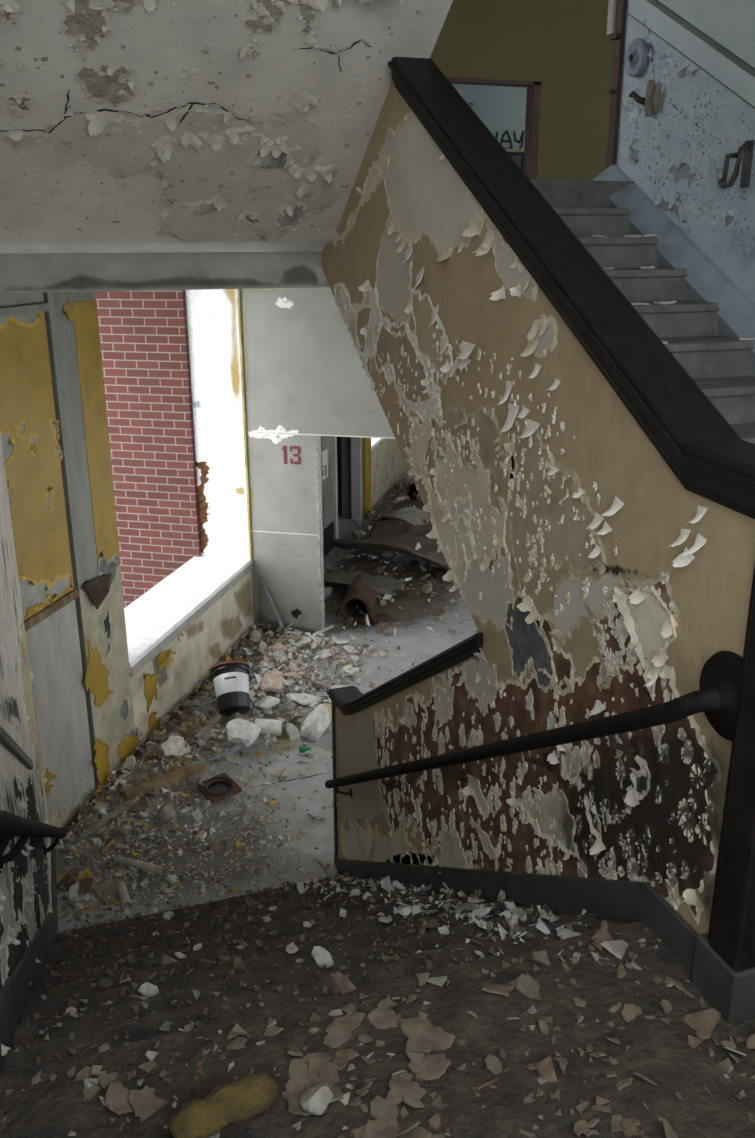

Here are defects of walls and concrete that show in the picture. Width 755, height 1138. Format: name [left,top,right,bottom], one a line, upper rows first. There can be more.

crack [0,90,262,141]
peeling [622,37,755,259]
peeling [0,0,722,926]
peeling [0,837,53,989]